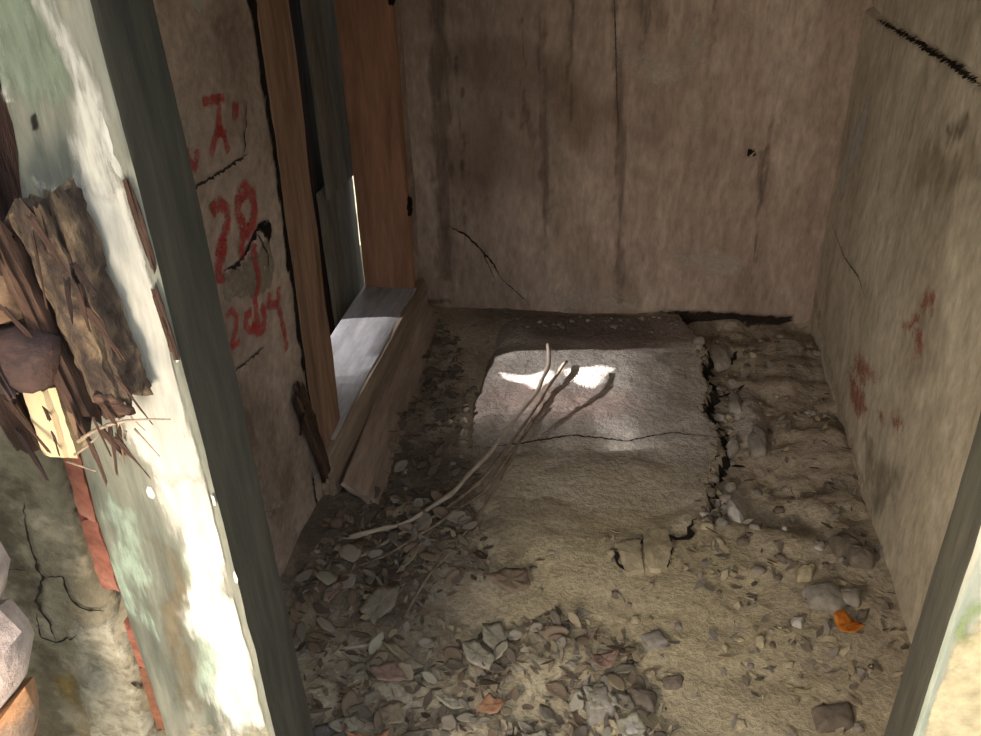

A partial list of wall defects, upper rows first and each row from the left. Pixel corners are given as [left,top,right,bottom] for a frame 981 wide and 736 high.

crack [877,19,981,86]
peeling [32,0,265,736]
spalling [221,0,316,417]
crack [449,226,524,299]
crack [483,344,745,572]
crack [8,504,103,643]